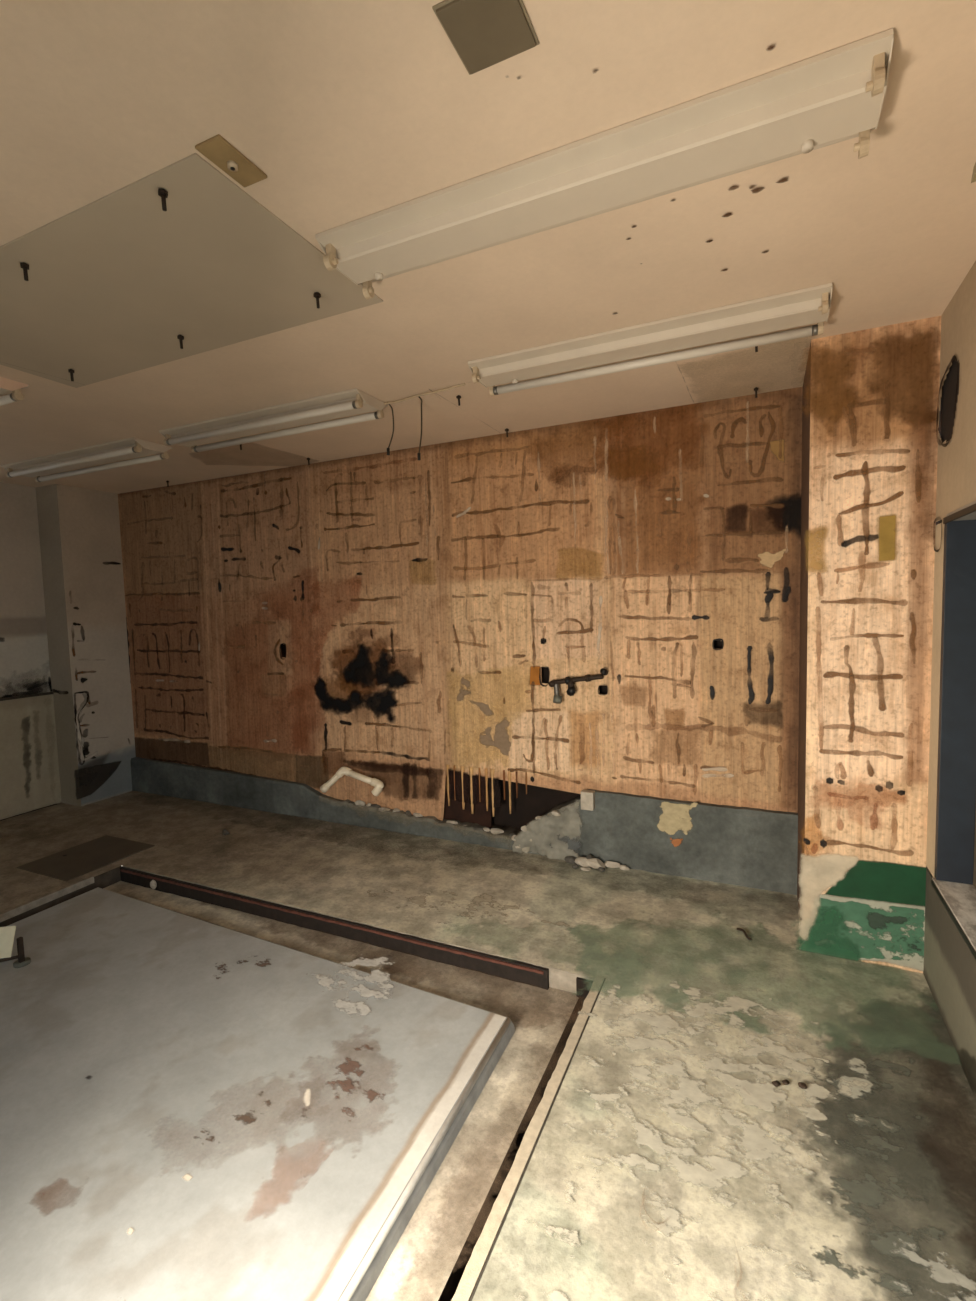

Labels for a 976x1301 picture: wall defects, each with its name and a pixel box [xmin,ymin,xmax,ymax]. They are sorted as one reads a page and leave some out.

damp [218,471,440,592]
damp [623,558,791,622]
damp [125,557,277,776]
damp [641,615,709,648]
damp [744,646,781,726]
damp [816,617,916,799]
damp [285,681,569,817]
spalling [348,800,582,861]
peeling [657,801,698,847]
peeling [798,854,925,971]
peeling [961,1050,976,1092]
peeling [894,1238,976,1301]